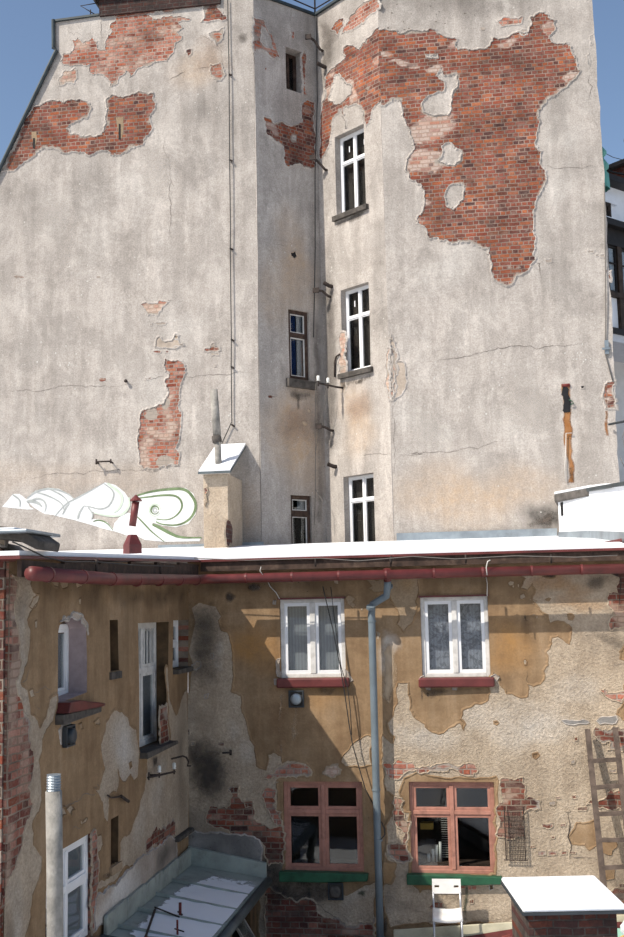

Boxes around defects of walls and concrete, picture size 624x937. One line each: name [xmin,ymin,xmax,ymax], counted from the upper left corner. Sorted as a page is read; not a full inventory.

flaking render [1,4,228,173]
flaking render [262,0,583,288]
flaking render [135,298,187,471]
corrosion [563,412,574,483]
flaking render [79,573,624,937]